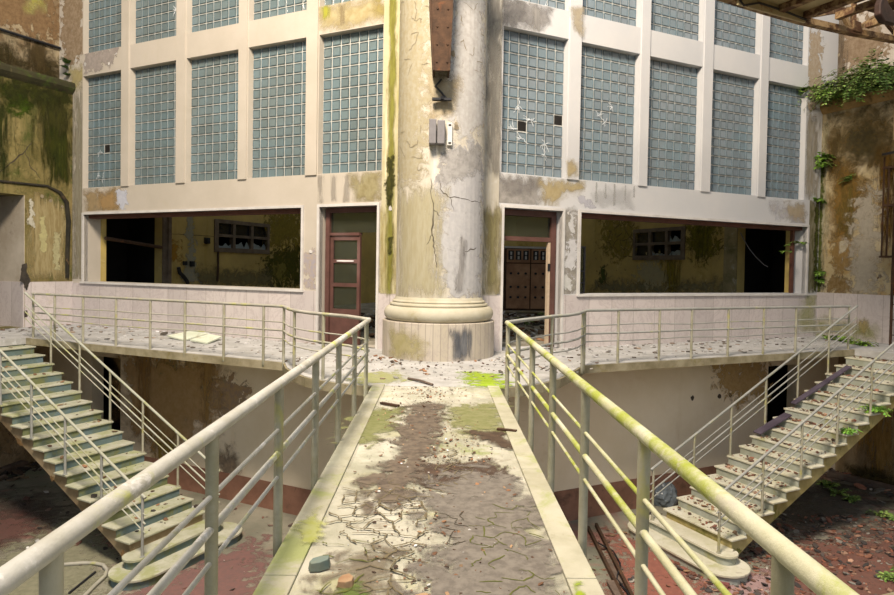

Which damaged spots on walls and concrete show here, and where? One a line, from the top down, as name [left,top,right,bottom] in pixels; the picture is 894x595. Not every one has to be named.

peeling [0,0,119,74]
peeling [572,7,584,34]
peeling [116,189,129,210]
crack [400,125,478,267]
damp [317,0,584,298]
peeling [564,196,596,294]
peeling [838,185,891,295]
damp [450,328,472,360]
damp [0,421,20,459]
crack [316,448,560,595]